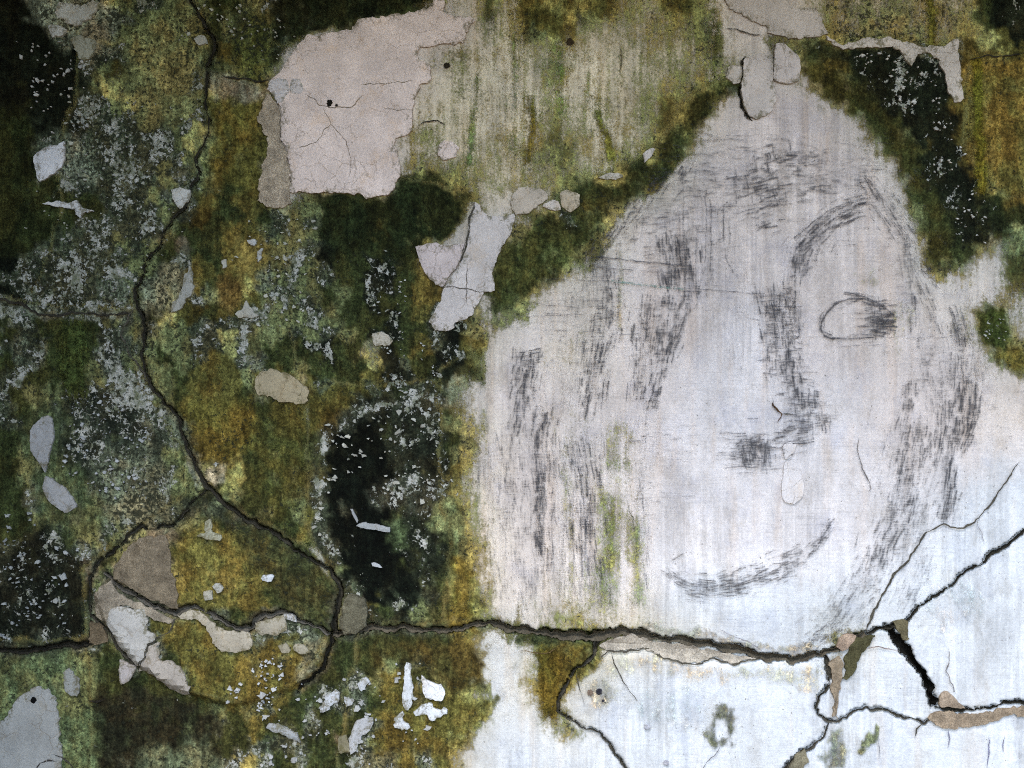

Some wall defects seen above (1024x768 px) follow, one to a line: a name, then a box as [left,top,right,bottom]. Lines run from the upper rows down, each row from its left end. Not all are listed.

crack [189,0,216,190]
crack [222,74,268,82]
peeling [197,0,475,327]
crack [299,80,446,176]
crack [726,28,760,121]
leakage [811,0,1024,197]
peeling [416,187,580,331]
peeling [0,668,81,768]
flaking render [88,535,385,767]
peeling [393,662,448,744]
crack [0,202,1024,768]
leakage [336,355,823,768]